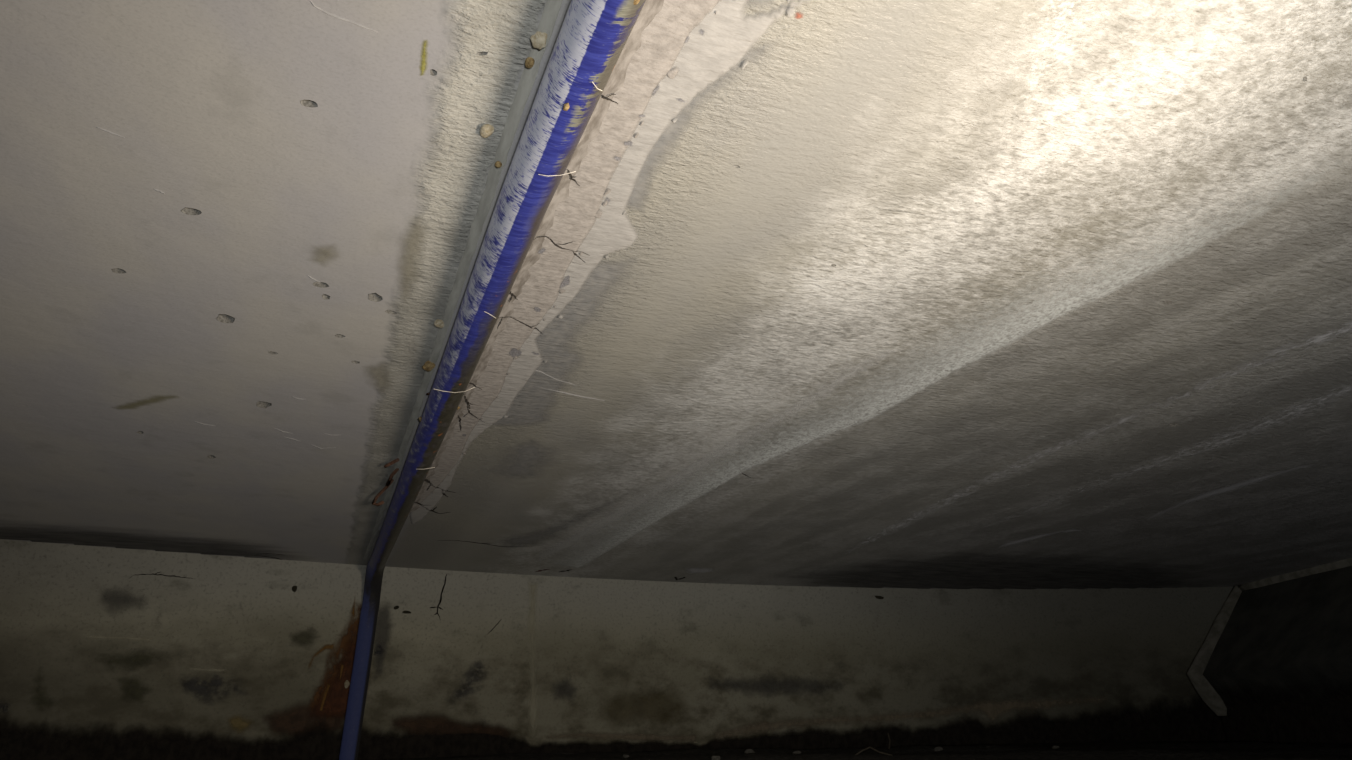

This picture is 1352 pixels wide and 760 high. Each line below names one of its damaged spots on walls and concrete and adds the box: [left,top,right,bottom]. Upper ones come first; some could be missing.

peeling [410,0,808,524]
corrosion [311,602,362,716]